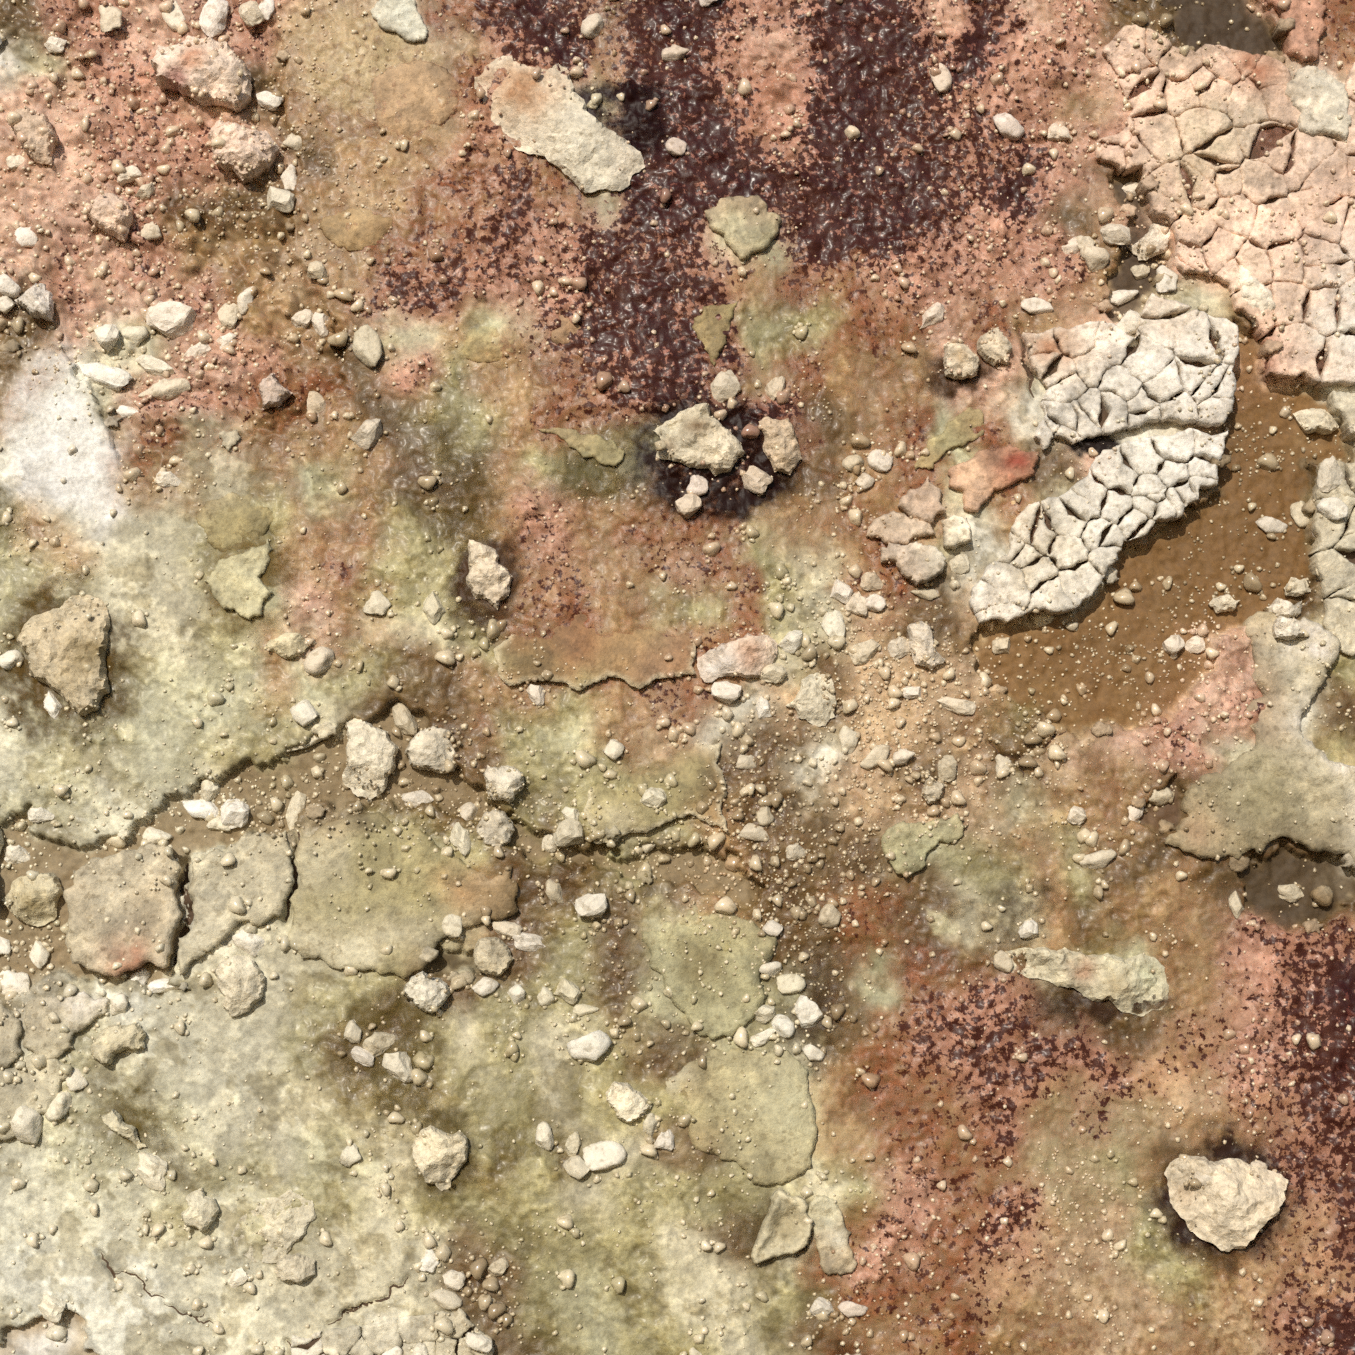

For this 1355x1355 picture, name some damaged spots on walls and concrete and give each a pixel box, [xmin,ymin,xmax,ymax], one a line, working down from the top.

rust [349,0,1123,455]
crack [968,24,1355,657]
rust [886,399,943,501]
rust [502,474,612,636]
rust [615,449,763,729]
rust [846,501,912,626]
crack [173,864,194,967]
crack [285,829,301,921]
flaking render [0,703,858,1284]
rust [813,914,1355,1355]
flaking render [0,1310,96,1355]
crack [287,1277,494,1355]